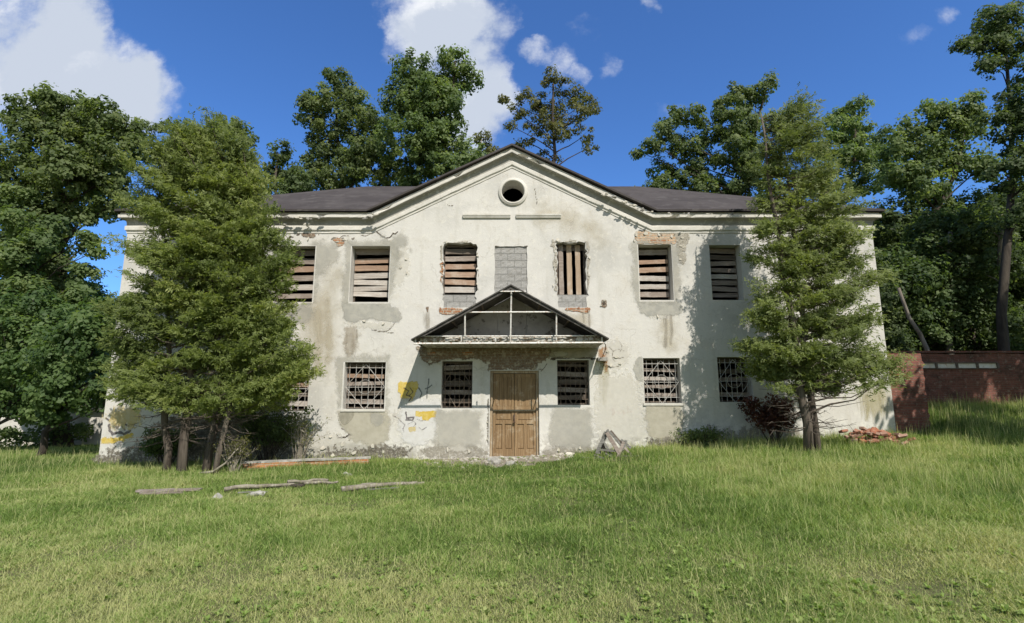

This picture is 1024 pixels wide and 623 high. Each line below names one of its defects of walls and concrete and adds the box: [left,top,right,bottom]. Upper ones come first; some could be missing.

flaking render [634,230,690,265]
flaking render [426,307,463,315]
flaking render [416,346,624,371]